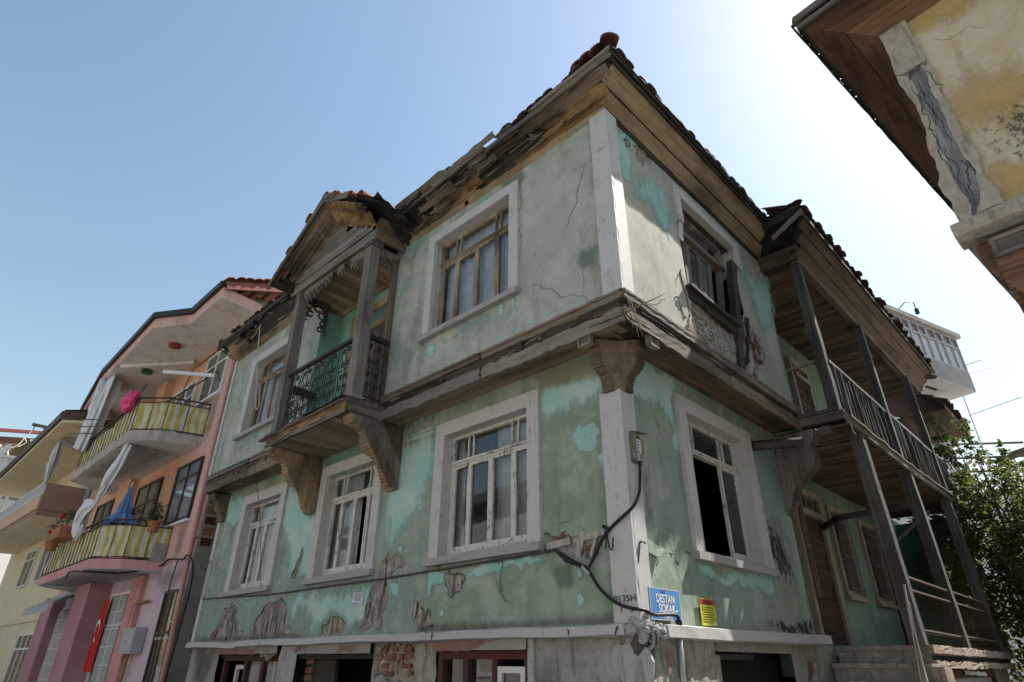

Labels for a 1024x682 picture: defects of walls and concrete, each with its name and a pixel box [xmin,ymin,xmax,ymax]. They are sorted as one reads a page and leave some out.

peeling [617,130,675,240]
crack [909,63,976,190]
leakage [952,73,1024,199]
peeling [205,415,609,682]